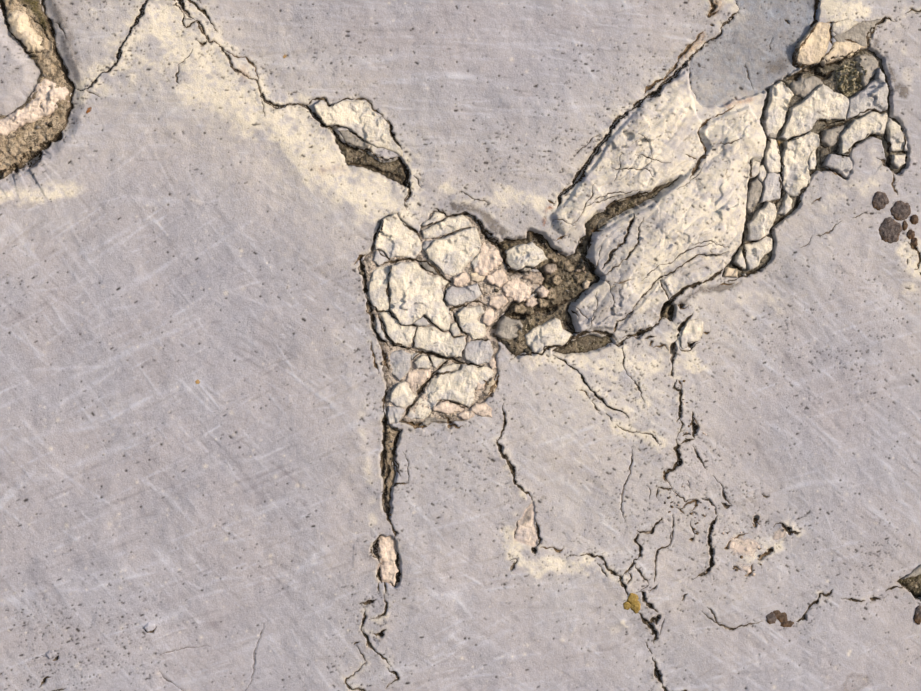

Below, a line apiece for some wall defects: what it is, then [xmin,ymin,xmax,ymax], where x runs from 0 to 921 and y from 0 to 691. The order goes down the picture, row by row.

spalling [0,0,75,179]
crack [75,1,147,97]
crack [174,0,421,240]
spalling [689,0,908,277]
crack [436,191,525,270]
spalling [358,178,678,429]
peeling [679,318,709,352]
crack [345,582,399,691]
spalling [370,534,402,587]
crack [370,345,409,540]
crack [496,313,732,691]
spalling [897,564,921,601]